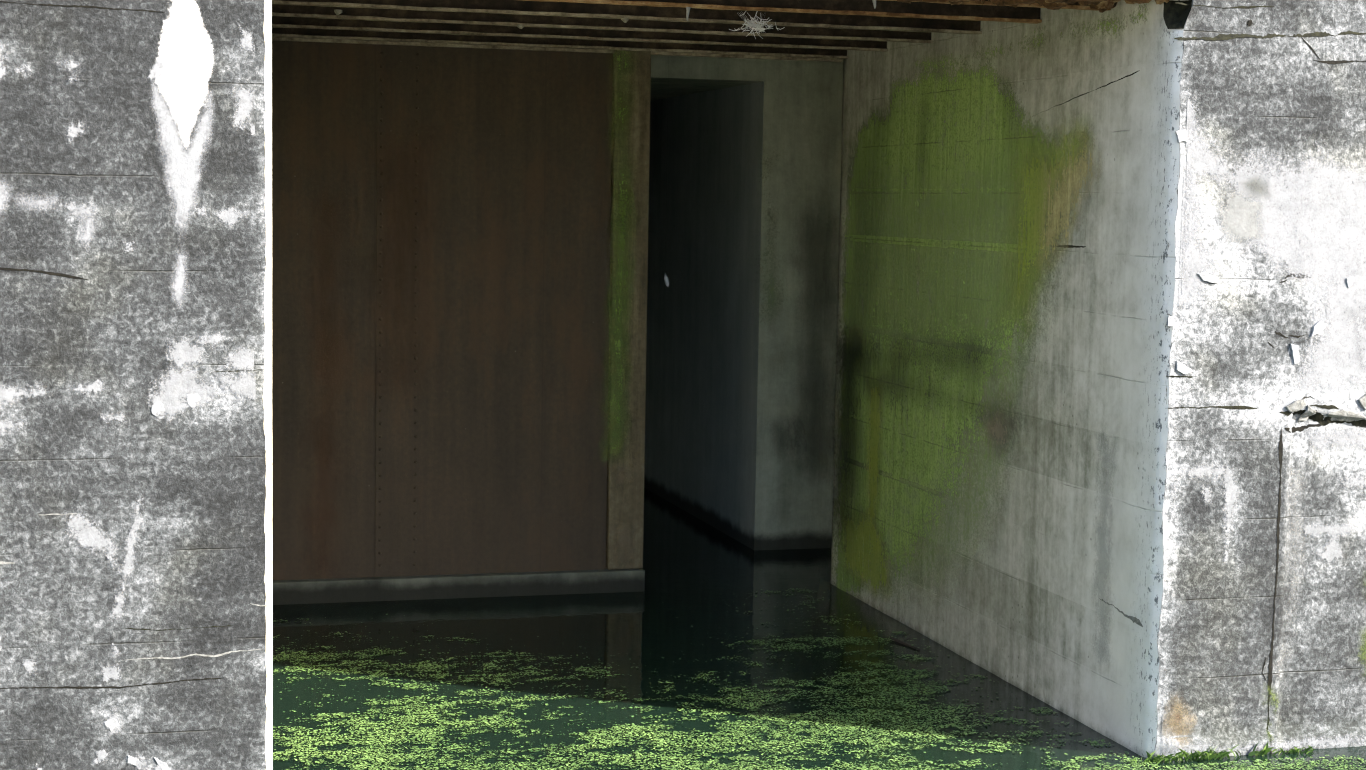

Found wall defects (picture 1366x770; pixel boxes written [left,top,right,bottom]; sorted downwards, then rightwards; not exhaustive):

crack [1174,2,1366,64]
crack [0,267,88,280]
damp [1018,138,1077,294]
flaking render [1166,99,1366,433]
crack [1166,375,1283,753]